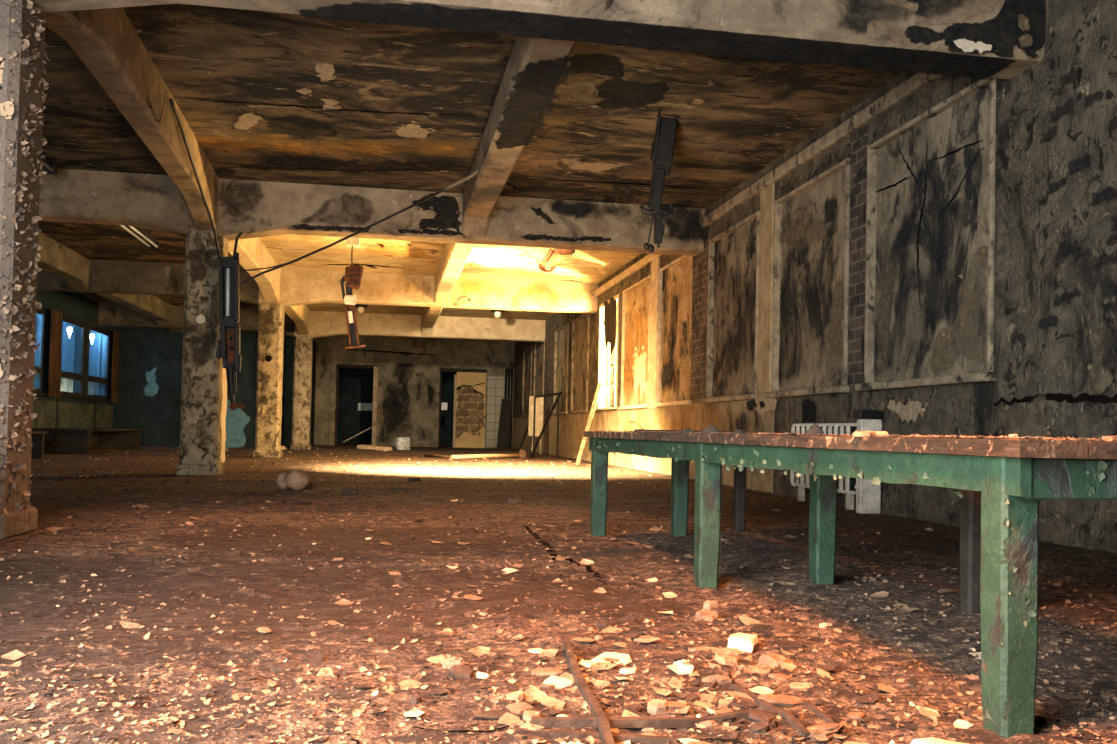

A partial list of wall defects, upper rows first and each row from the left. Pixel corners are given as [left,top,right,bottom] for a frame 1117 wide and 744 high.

spalling [298,0,1048,80]
damp [891,0,999,27]
peeling [233,112,263,134]
peeling [296,61,342,110]
peeling [392,121,436,141]
spalling [495,55,635,173]
peeling [0,0,50,514]
damp [887,146,980,367]
damp [779,198,838,384]
spalling [455,385,485,438]
crack [524,525,606,583]